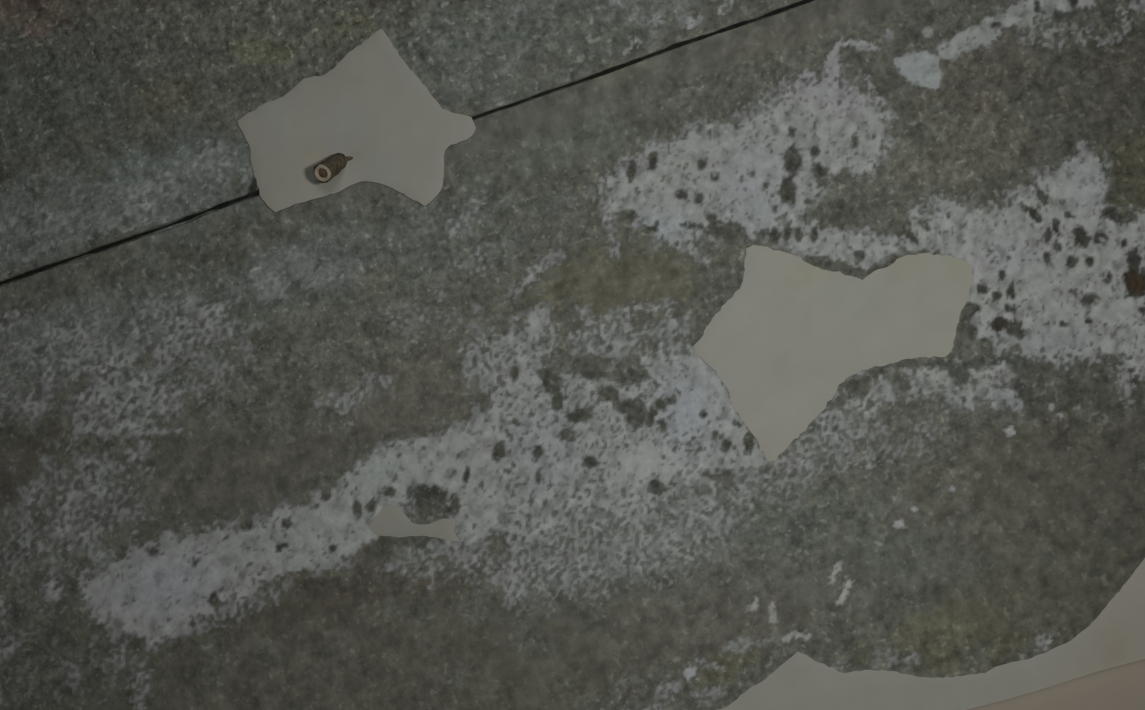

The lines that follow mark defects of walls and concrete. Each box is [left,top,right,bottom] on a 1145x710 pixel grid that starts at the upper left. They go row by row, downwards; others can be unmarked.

crack [472,0,814,119]
damp [609,0,704,56]
damp [893,0,1145,91]
flaking render [237,29,477,213]
crack [0,180,259,285]
damp [446,190,509,276]
damp [507,249,565,298]
damp [583,38,1145,421]
flaking render [693,245,974,462]
flaking render [368,505,460,542]
damp [0,270,949,710]
peeling [716,557,1145,710]